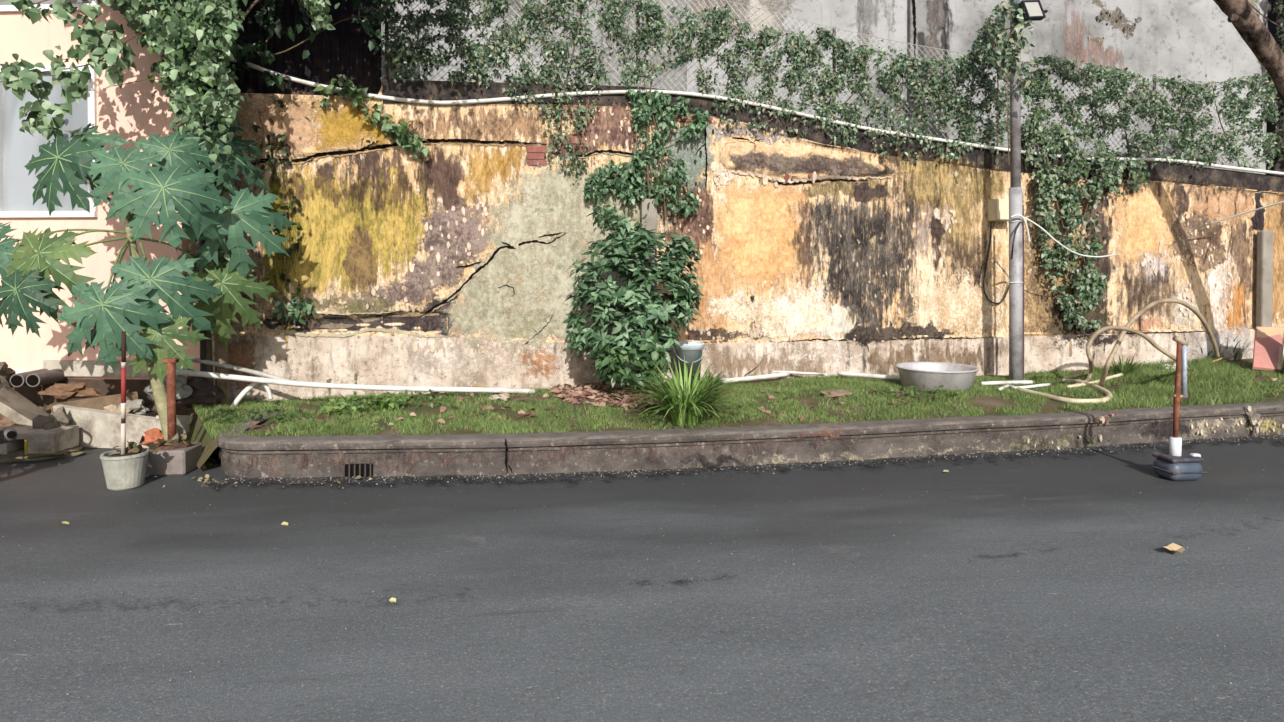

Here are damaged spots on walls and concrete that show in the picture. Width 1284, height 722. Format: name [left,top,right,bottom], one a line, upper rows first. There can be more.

peeling [1087,0,1142,46]
leakage [229,94,552,348]
crack [317,232,567,320]
crack [254,138,645,180]
leakage [684,151,1008,379]
leakage [1024,174,1284,365]